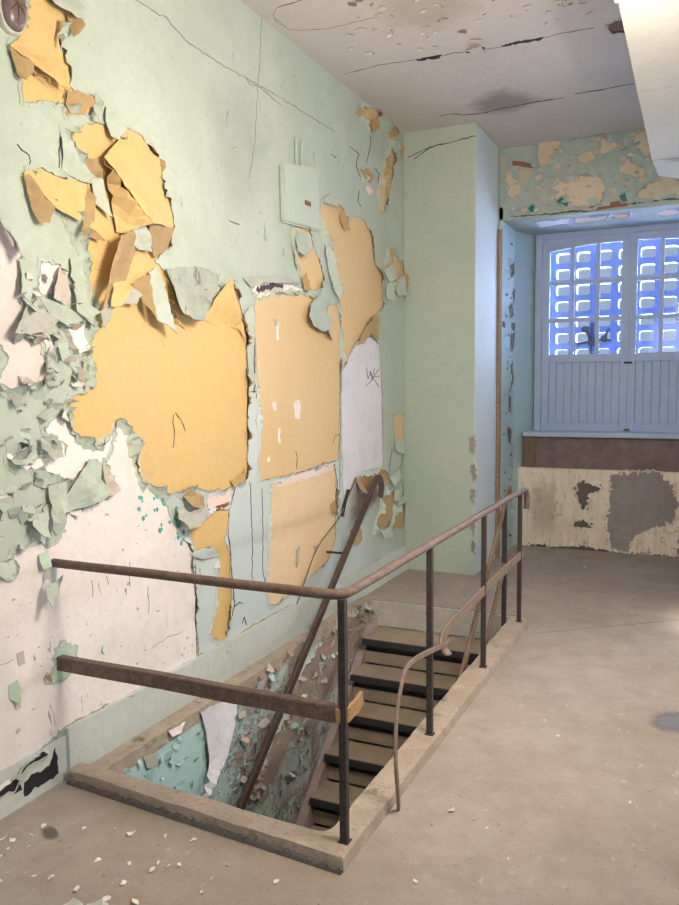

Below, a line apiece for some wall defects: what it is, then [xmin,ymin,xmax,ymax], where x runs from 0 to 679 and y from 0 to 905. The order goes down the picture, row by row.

spalling [67,779,343,875]